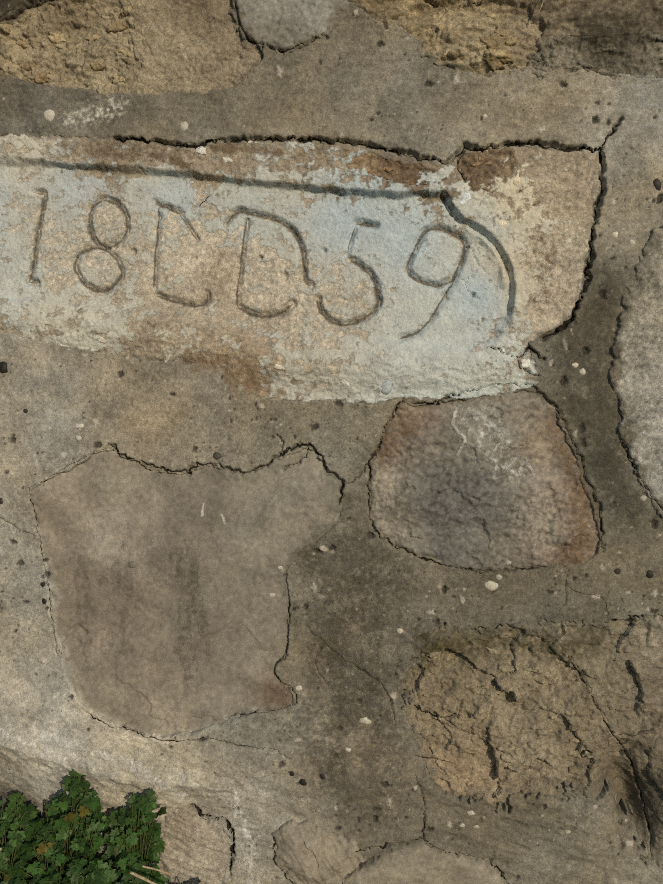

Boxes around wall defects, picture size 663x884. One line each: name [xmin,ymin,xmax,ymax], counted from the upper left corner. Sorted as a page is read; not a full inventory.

peeling [0,133,585,404]
crack [116,121,620,552]
crack [2,389,544,652]
crack [342,778,509,884]
crack [414,702,504,753]
spalling [414,635,612,789]